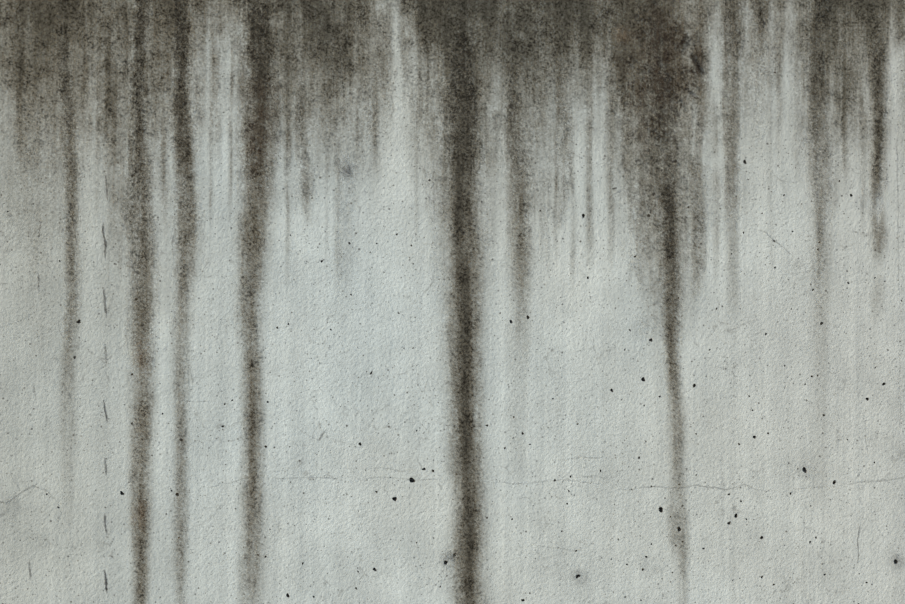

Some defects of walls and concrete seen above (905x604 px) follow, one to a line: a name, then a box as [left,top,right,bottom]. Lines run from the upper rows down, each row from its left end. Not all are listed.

leakage [58,27,77,333]
leakage [129,0,152,604]
leakage [173,0,196,578]
leakage [239,0,279,588]
leakage [441,27,483,604]
leakage [505,79,530,295]
leakage [621,6,703,482]
leakage [722,0,741,197]
leakage [753,0,767,29]
leakage [807,0,828,204]
leakage [870,40,885,198]